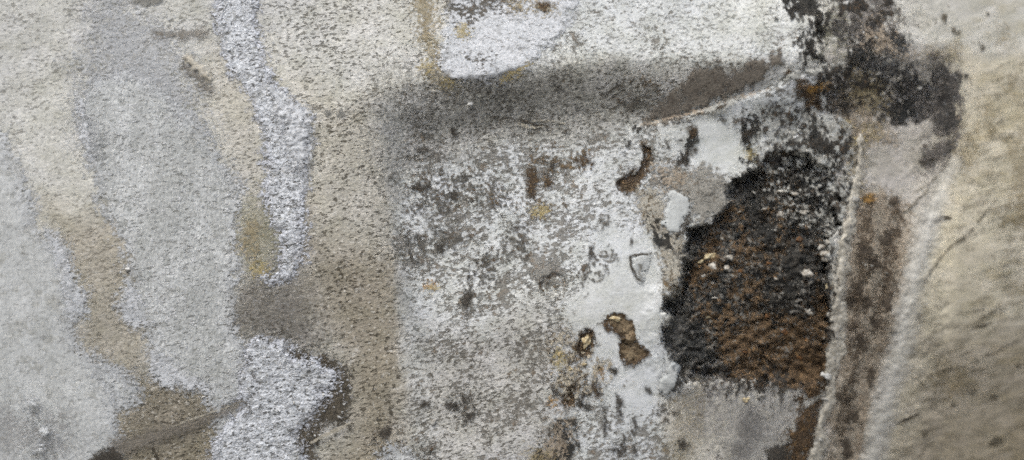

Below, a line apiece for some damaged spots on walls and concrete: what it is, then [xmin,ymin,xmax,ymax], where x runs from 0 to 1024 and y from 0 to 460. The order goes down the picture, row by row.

spalling [386,71,862,460]
mould [770,0,975,187]